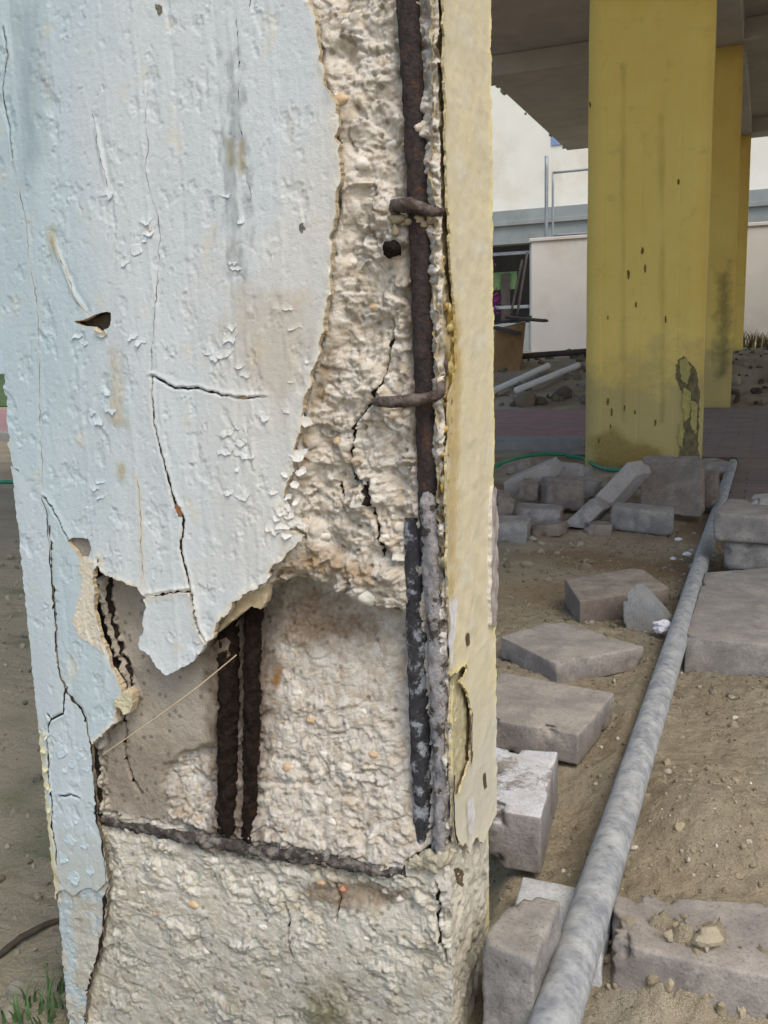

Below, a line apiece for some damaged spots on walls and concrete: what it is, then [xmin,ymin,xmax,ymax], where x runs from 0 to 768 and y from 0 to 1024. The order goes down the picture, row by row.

spalling [40,0,473,1024]
crack [339,321,396,556]
flaking render [487,486,499,627]
peeling [675,356,701,457]
crack [105,577,136,782]